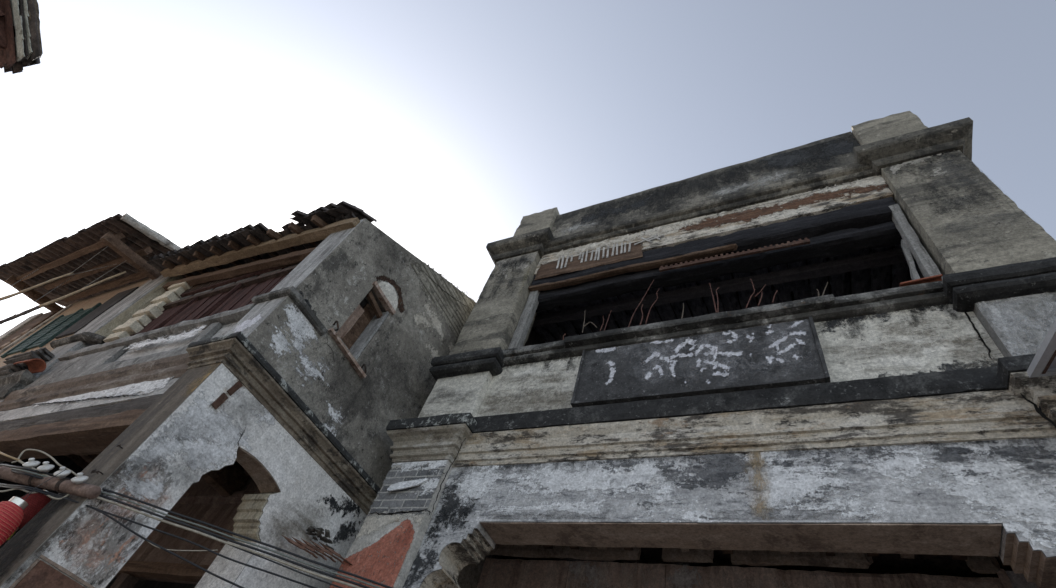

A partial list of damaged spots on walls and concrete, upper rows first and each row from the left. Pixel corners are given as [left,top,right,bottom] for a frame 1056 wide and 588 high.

peeling [269,304,329,386]
peeling [256,405,275,429]
peeling [325,401,343,437]
peeling [53,391,252,588]
damp [317,495,364,544]
flaking render [356,460,448,539]
damp [403,470,482,588]
peeling [454,440,1056,548]